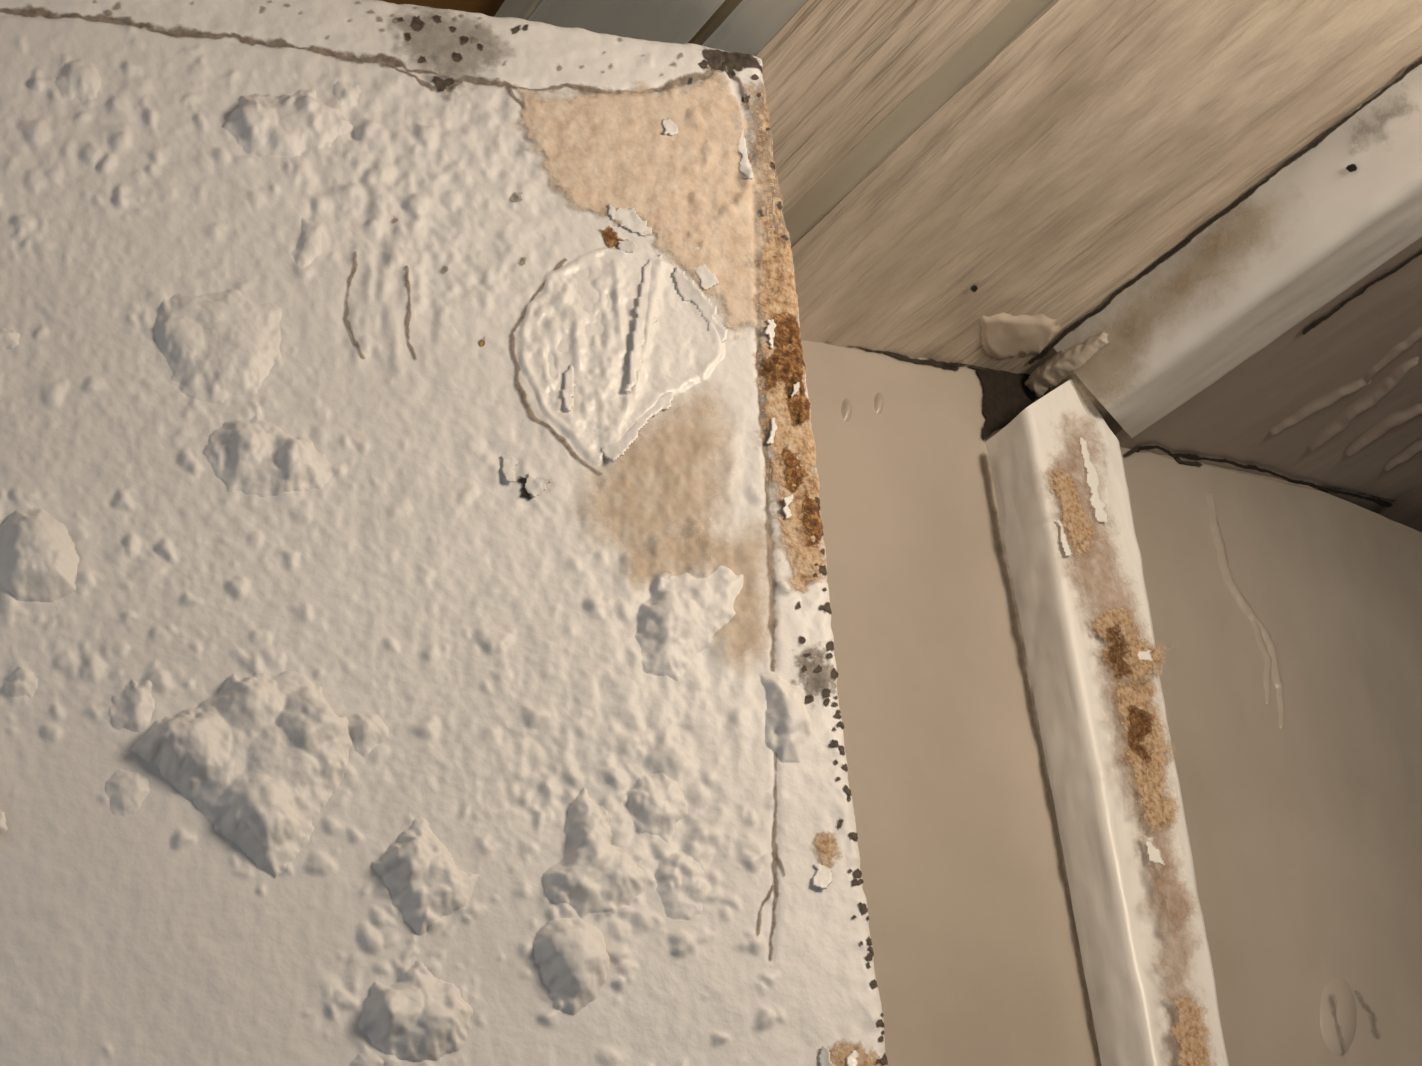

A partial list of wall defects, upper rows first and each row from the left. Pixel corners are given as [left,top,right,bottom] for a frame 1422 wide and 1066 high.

crack [0,6,752,167]
water stain [356,2,506,92]
crack [344,252,365,359]
crack [405,266,416,359]
peeling [510,72,768,475]
water stain [600,408,764,659]
water stain [813,530,832,614]
water stain [792,636,852,801]
crack [757,752,785,961]
water stain [848,869,864,886]
water stain [852,902,878,988]
water stain [876,1013,888,1066]